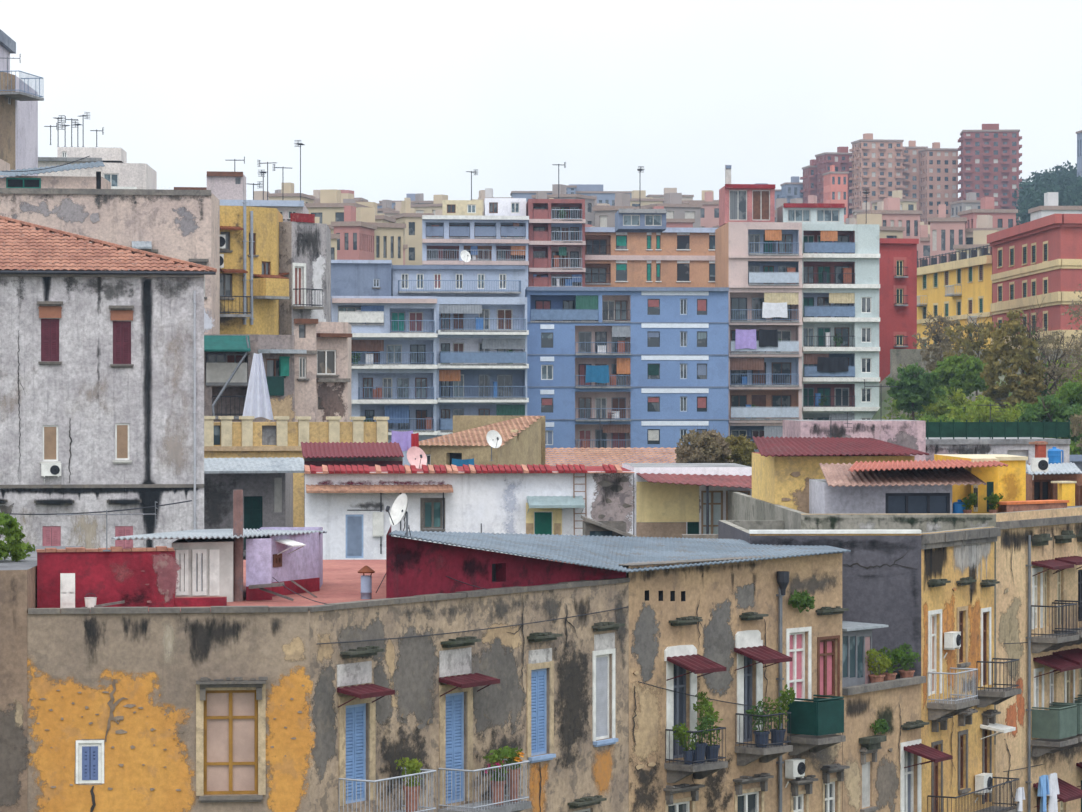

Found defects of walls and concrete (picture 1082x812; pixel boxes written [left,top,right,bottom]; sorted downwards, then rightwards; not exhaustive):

peeling [4,197,99,263]
peeling [172,207,198,237]
leakage [297,228,320,259]
leakage [0,277,235,549]
spalling [317,382,347,422]
leakage [603,477,620,502]
leakage [85,622,98,652]
leakage [186,621,241,662]
spalling [998,588,1025,737]
peeling [14,660,195,812]
peeling [266,633,334,812]